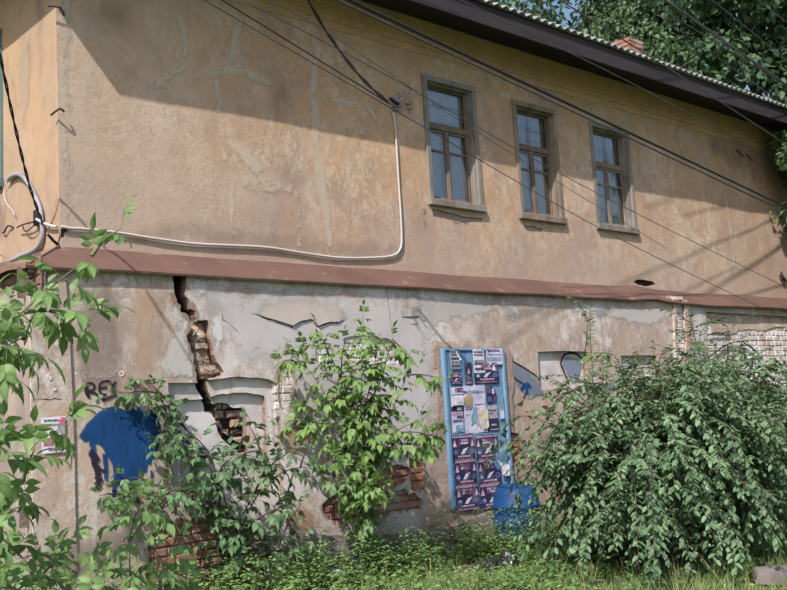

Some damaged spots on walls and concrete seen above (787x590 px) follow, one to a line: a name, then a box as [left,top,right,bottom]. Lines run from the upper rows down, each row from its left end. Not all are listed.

spalling [432,209,482,224]
peeling [160,292,198,383]
crack [173,276,247,453]
crack [254,314,342,328]
peeling [194,279,518,443]
peeling [542,295,684,371]
peeling [692,307,787,362]
spalling [320,457,426,526]